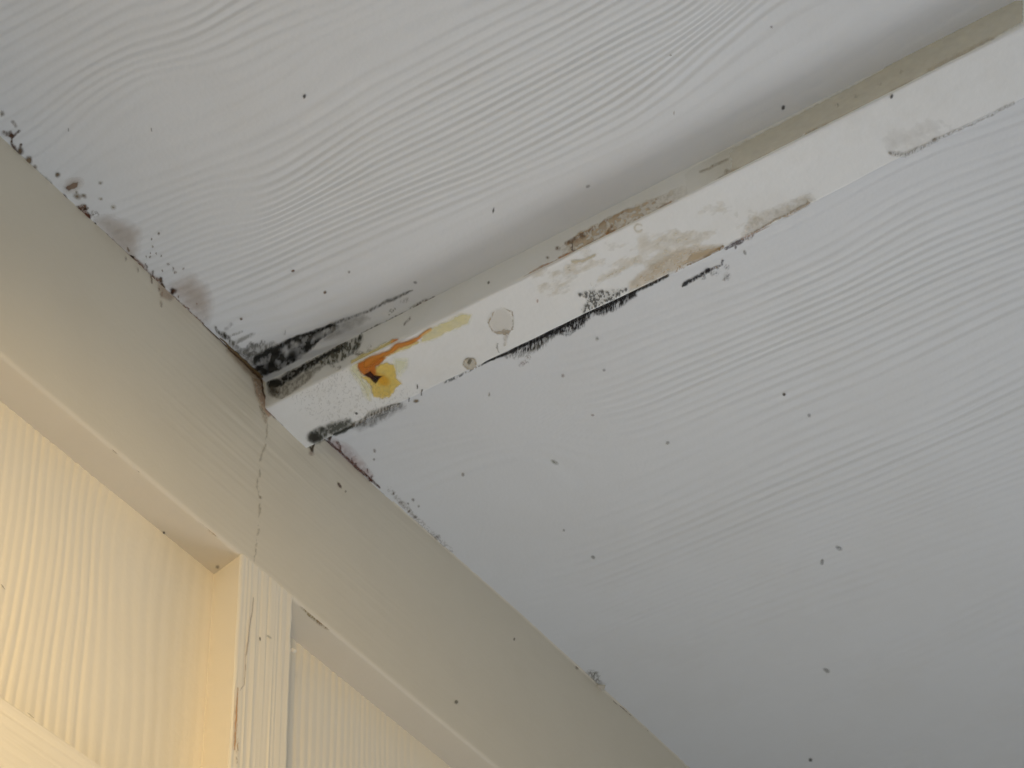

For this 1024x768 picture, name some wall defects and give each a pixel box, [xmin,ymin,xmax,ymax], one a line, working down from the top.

water stain [112,233,378,396]
mould [308,385,423,452]
corrosion [351,316,464,398]
water stain [445,202,810,383]